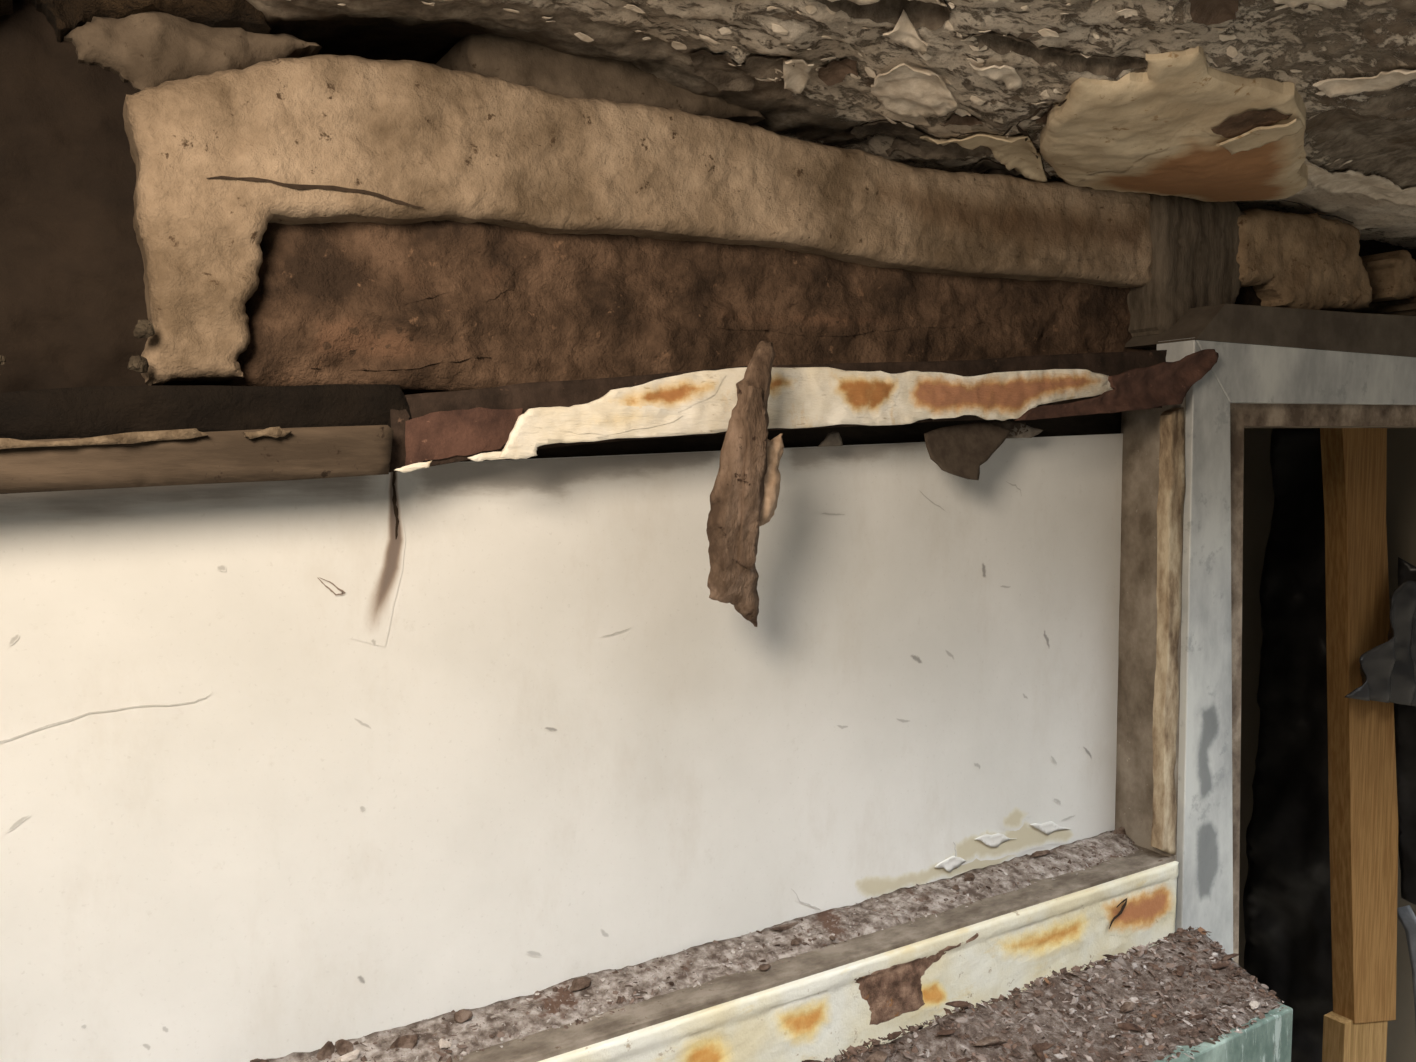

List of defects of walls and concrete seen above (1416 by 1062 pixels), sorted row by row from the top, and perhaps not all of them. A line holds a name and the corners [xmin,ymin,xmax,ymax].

peeling [672,0,1148,182]
peeling [1313,69,1416,98]
crack [207,176,424,208]
rust [1078,116,1306,202]
peeling [1304,158,1416,208]
spalling [218,220,1149,395]
rust [831,349,1219,421]
peeling [924,421,1043,480]
crack [0,692,213,743]
peeling [852,805,1075,900]
rust [854,878,1176,1041]
rust [1032,1043,1056,1061]